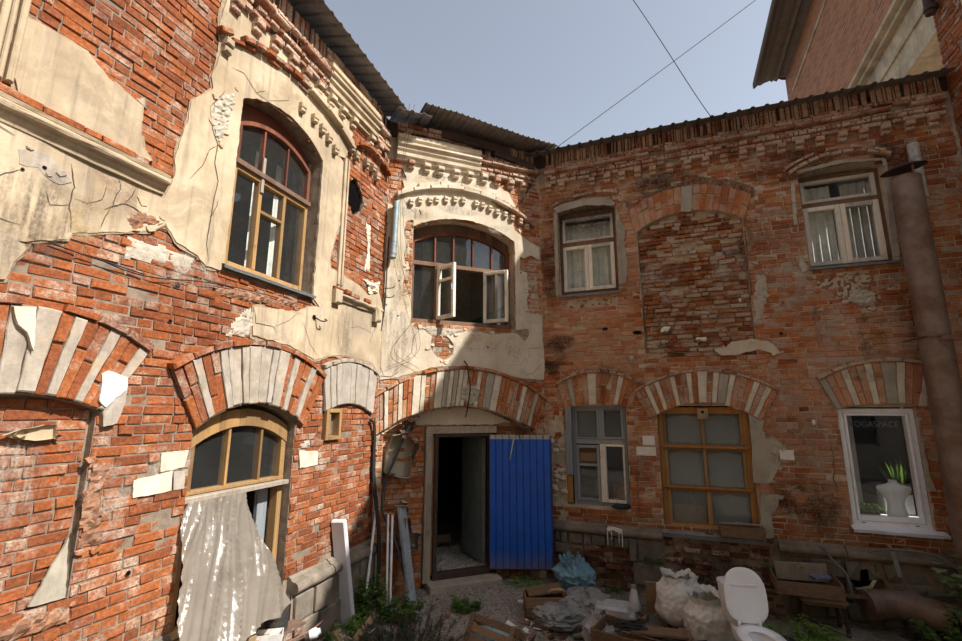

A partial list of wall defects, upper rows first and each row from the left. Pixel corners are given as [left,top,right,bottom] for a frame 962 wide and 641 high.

crack [46,163,140,226]
spalling [127,197,167,232]
crack [194,91,225,252]
spalling [410,323,495,364]